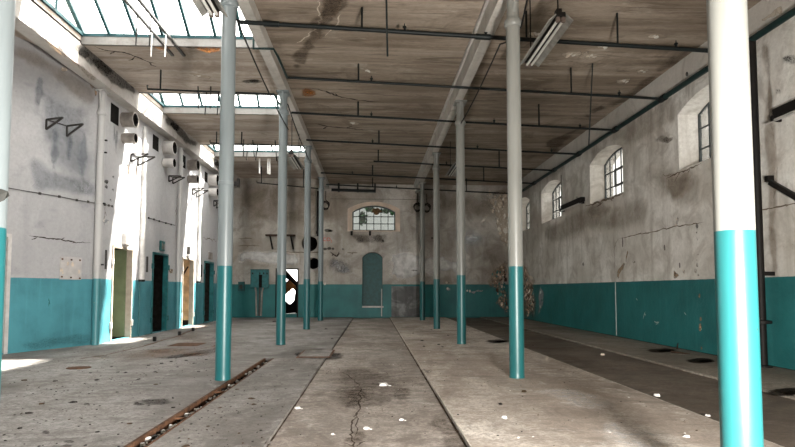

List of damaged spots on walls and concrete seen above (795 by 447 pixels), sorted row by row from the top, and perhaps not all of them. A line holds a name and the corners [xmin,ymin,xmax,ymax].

crack [32,235,90,243]
crack [614,222,702,258]
flaking render [466,263,508,309]
peeling [523,267,544,316]
crack [339,368,365,447]